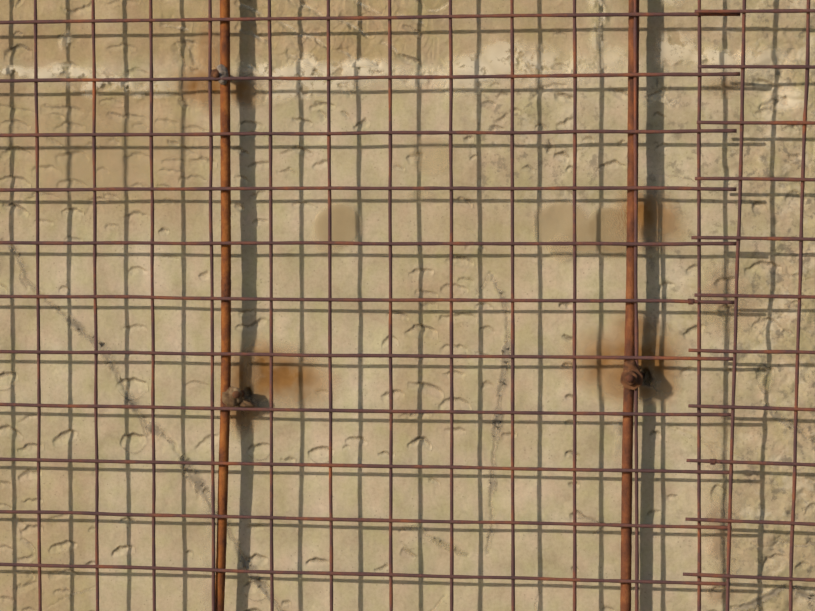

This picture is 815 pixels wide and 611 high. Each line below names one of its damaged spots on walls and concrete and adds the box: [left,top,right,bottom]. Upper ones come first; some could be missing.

damp [0,65,131,92]
damp [246,56,388,95]
damp [455,45,548,89]
damp [661,43,732,65]
damp [315,205,359,246]
damp [538,204,627,255]
crack [40,294,209,499]
rust [230,344,322,427]
crack [488,296,510,496]
rust [581,320,625,398]
rust [638,316,676,398]
crack [215,518,281,611]